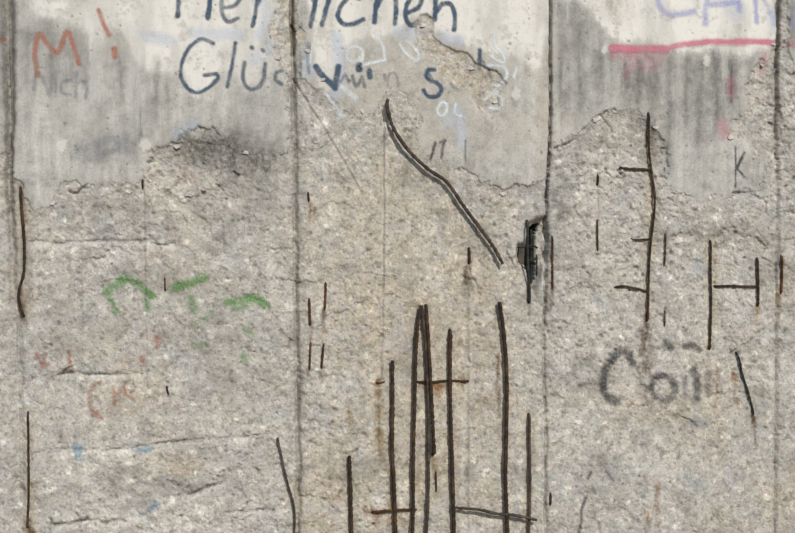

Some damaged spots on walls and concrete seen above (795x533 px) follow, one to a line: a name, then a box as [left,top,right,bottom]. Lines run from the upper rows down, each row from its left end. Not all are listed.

spalling [0,0,299,533]
spalling [292,0,795,533]